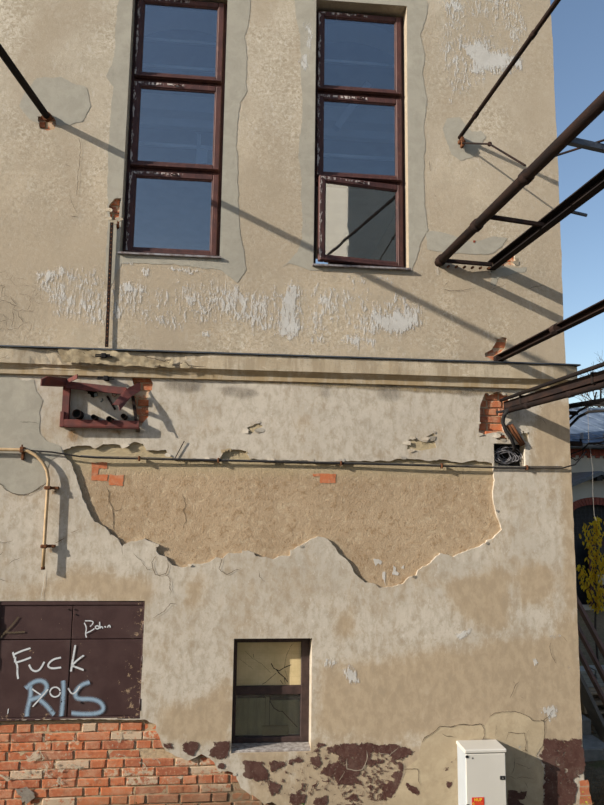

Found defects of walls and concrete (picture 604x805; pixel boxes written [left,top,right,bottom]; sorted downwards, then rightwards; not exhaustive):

peeling [442,0,526,101]
flaking render [38,114,56,130]
flaking render [106,171,179,250]
peeling [36,267,422,348]
flaking render [485,336,506,361]
flaking render [476,392,508,442]
flaking render [64,378,501,587]
crack [122,552,174,615]
flaking render [0,719,420,805]
crack [422,685,553,795]
peeling [508,790,527,805]
peeling [539,738,592,805]